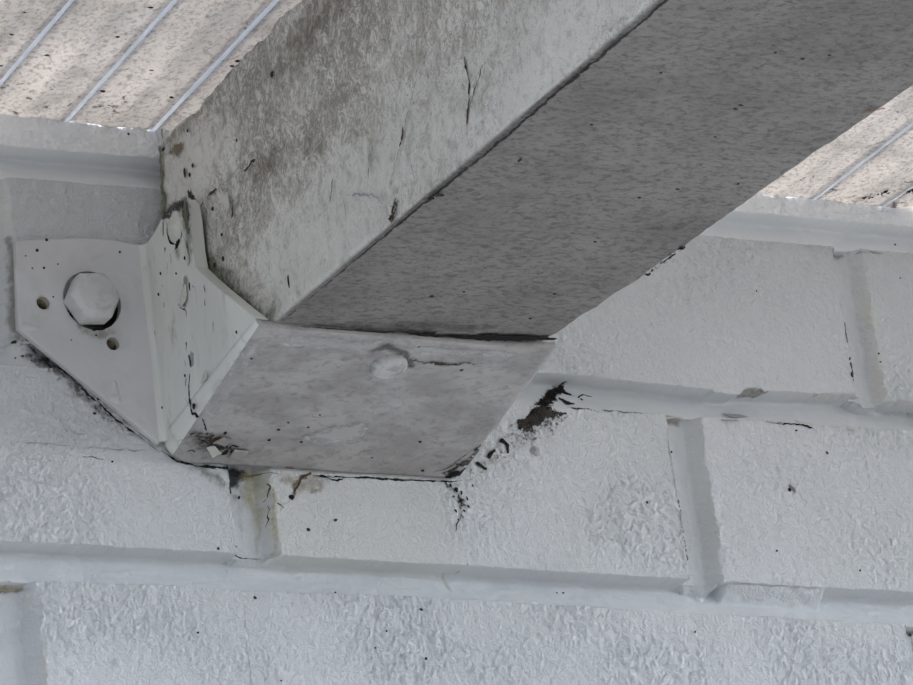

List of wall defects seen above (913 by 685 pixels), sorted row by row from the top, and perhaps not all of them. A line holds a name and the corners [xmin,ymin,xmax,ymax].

crack [456,52,482,150]
peeling [198,431,248,461]
water stain [313,381,637,530]